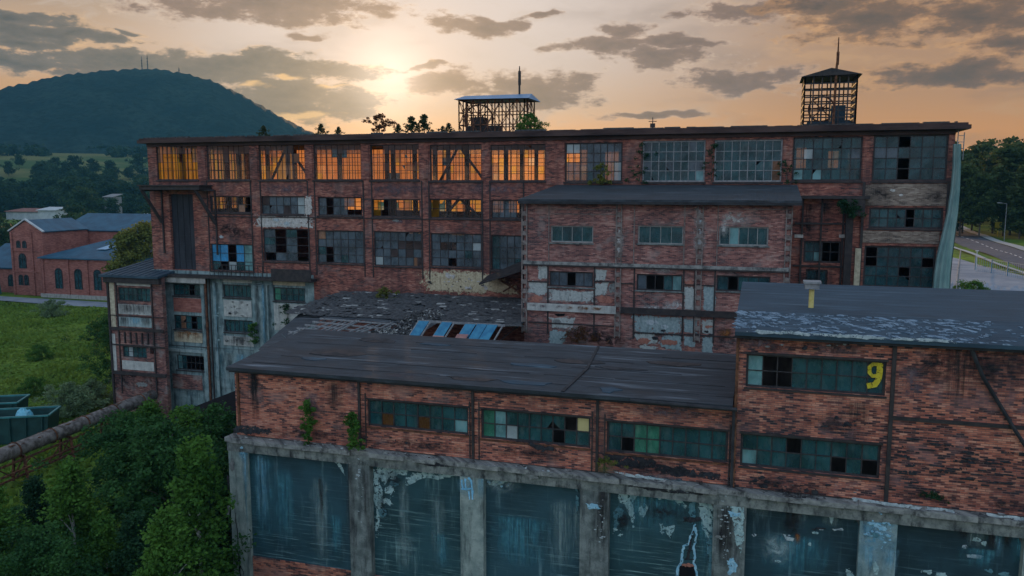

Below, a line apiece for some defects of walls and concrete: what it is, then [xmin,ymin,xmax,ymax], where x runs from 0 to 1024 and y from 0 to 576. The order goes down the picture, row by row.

peeling [418,266,615,303]
peeling [548,316,577,344]
peeling [630,279,716,353]
peeling [732,310,1024,352]
peeling [335,458,456,538]
spalling [575,452,756,576]